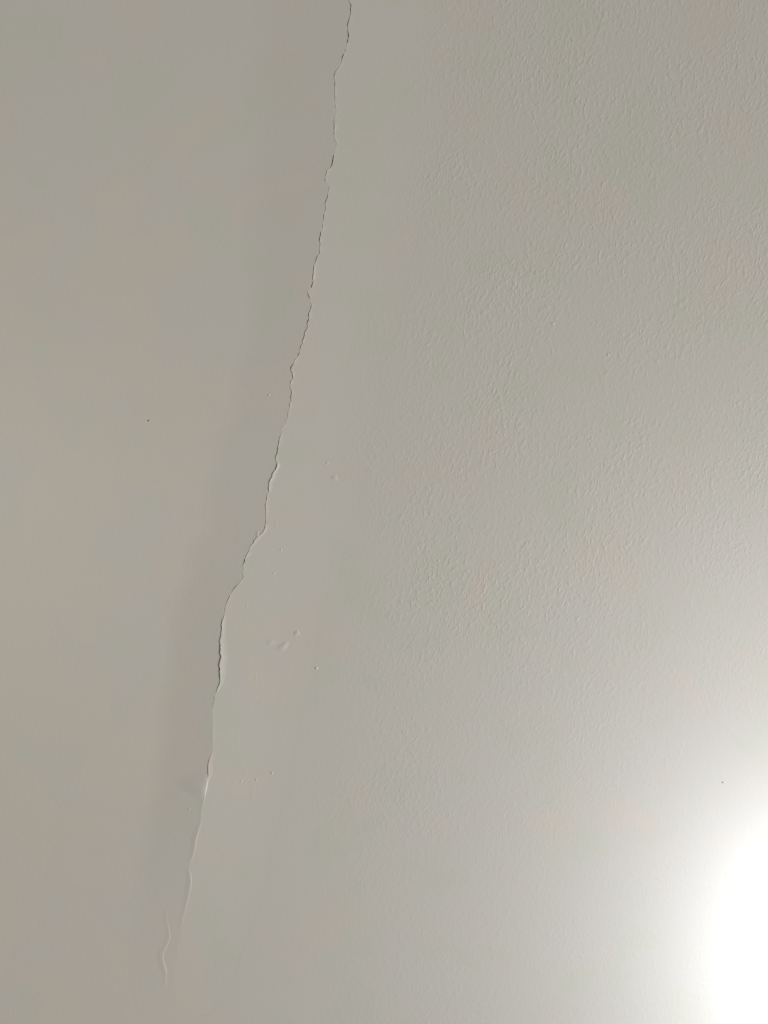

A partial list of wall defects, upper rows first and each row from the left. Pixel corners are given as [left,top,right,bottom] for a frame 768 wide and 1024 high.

crack [157,2,351,988]